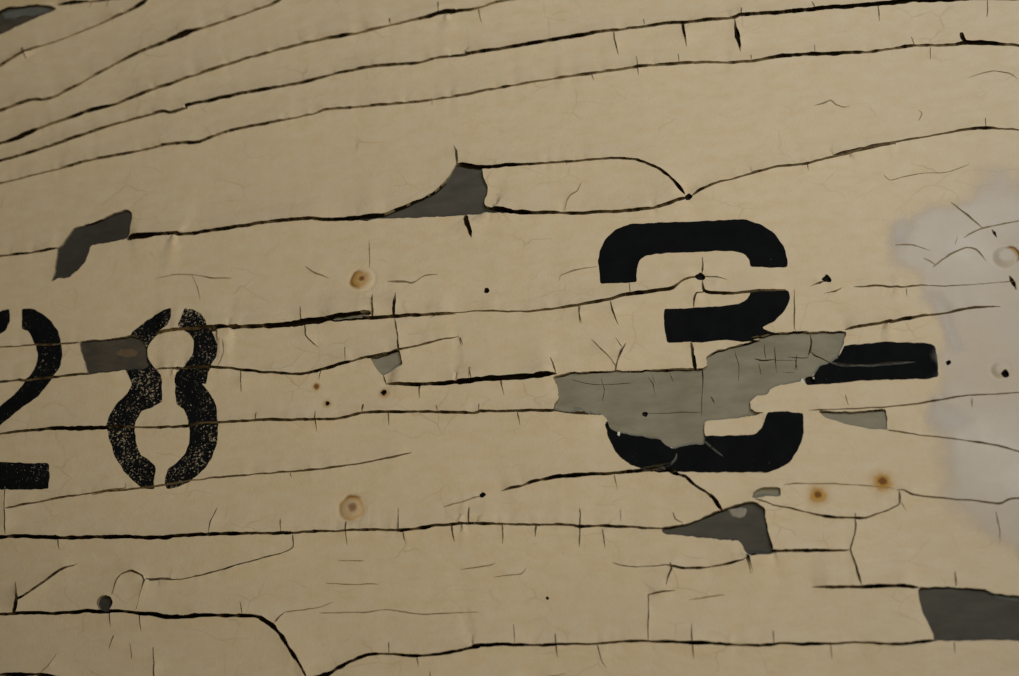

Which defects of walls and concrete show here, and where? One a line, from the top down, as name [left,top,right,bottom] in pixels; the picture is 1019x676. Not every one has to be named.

crack [0,0,1019,184]
peeling [361,165,503,220]
crack [454,111,1019,237]
peeling [51,209,132,282]
crack [0,202,1019,435]
peeling [553,331,846,449]
crack [814,392,1019,452]
peeling [662,487,781,554]
rust [811,489,826,501]
rust [875,475,890,489]
crack [0,452,1019,676]
peeling [918,586,1019,641]